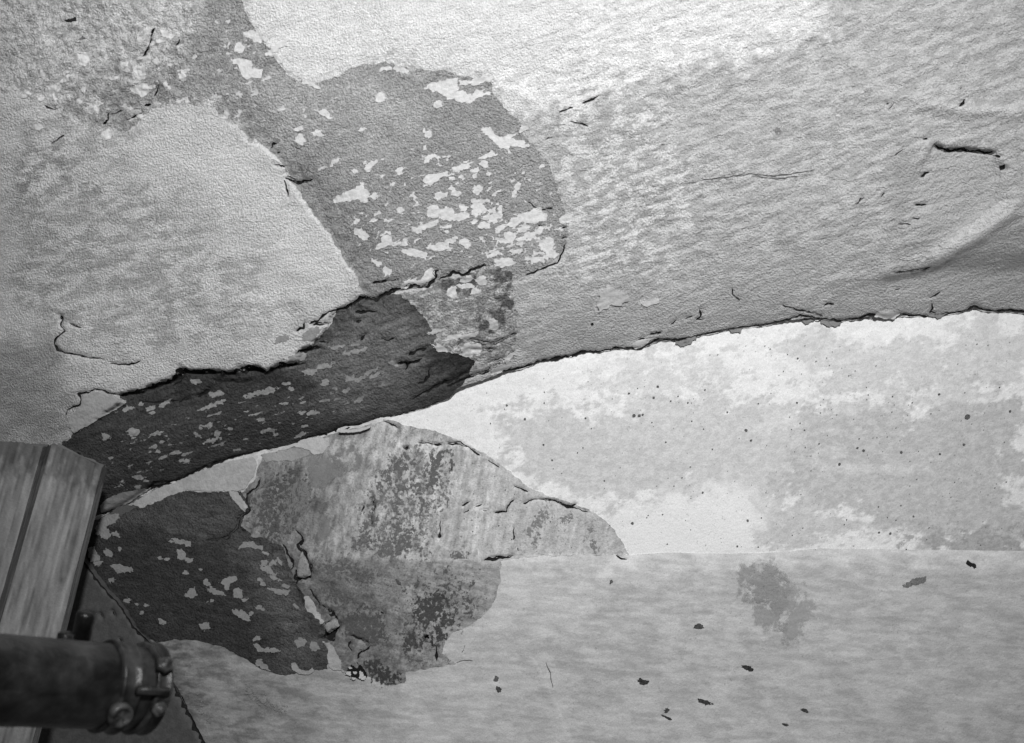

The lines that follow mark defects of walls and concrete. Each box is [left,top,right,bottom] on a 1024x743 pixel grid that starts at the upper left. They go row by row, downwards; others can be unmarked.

crack [895,138,1005,170]
peeling [0,0,573,675]
crack [54,264,1024,514]
damp [738,560,816,645]
spalling [345,665,367,680]